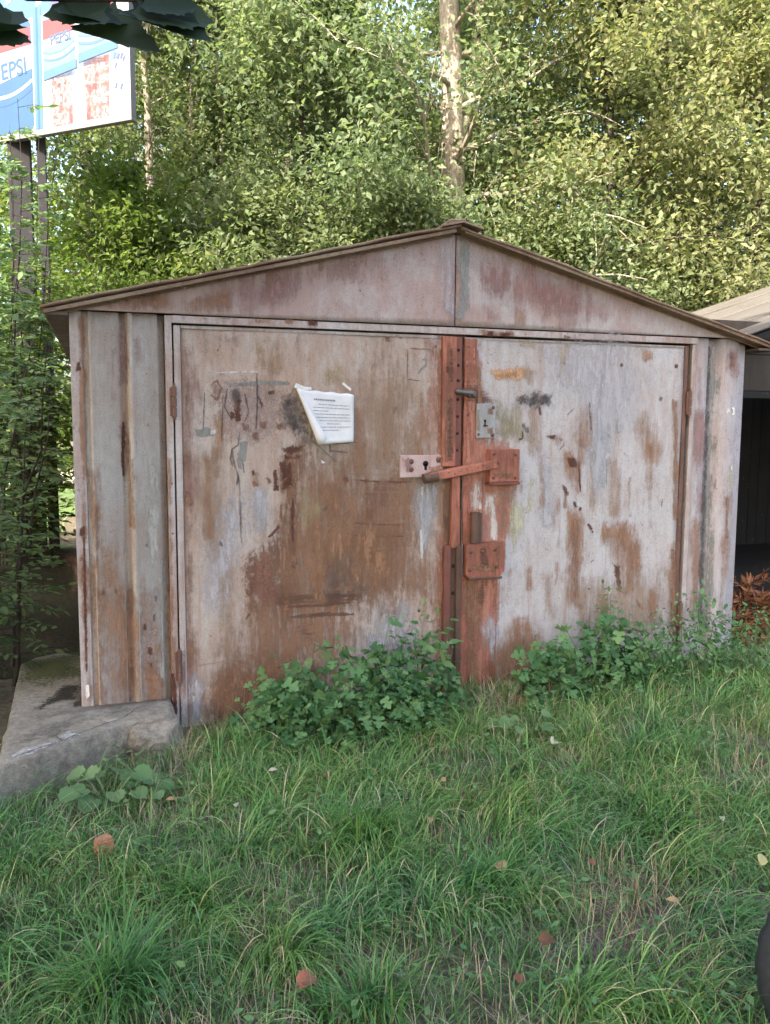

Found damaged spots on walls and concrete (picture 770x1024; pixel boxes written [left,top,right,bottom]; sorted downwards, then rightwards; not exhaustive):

rust [76,316,537,724]
rust [530,402,676,630]